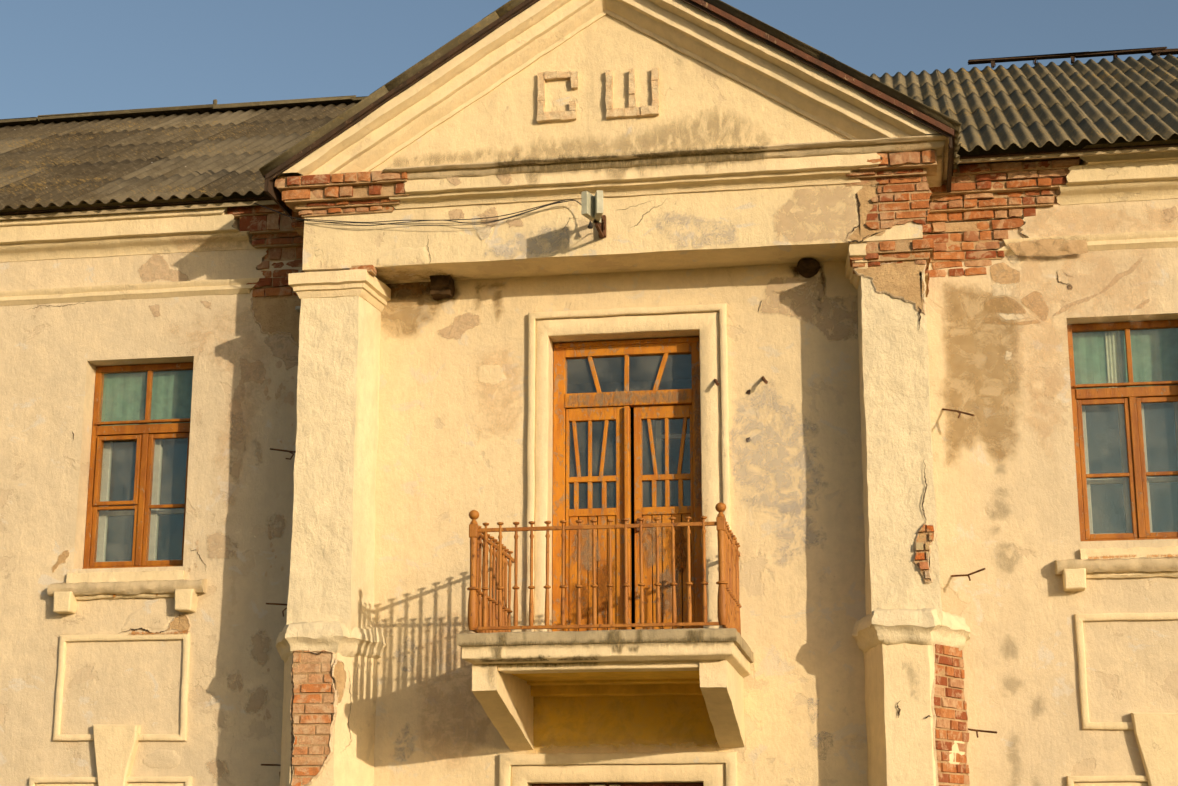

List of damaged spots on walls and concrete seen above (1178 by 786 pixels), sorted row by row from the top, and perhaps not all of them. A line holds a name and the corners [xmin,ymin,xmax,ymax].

leakage [497,146,764,173]
spalling [776,150,1142,325]
spalling [227,171,410,481]
spalling [913,523,935,584]
spalling [289,649,347,786]
spalling [931,644,970,786]